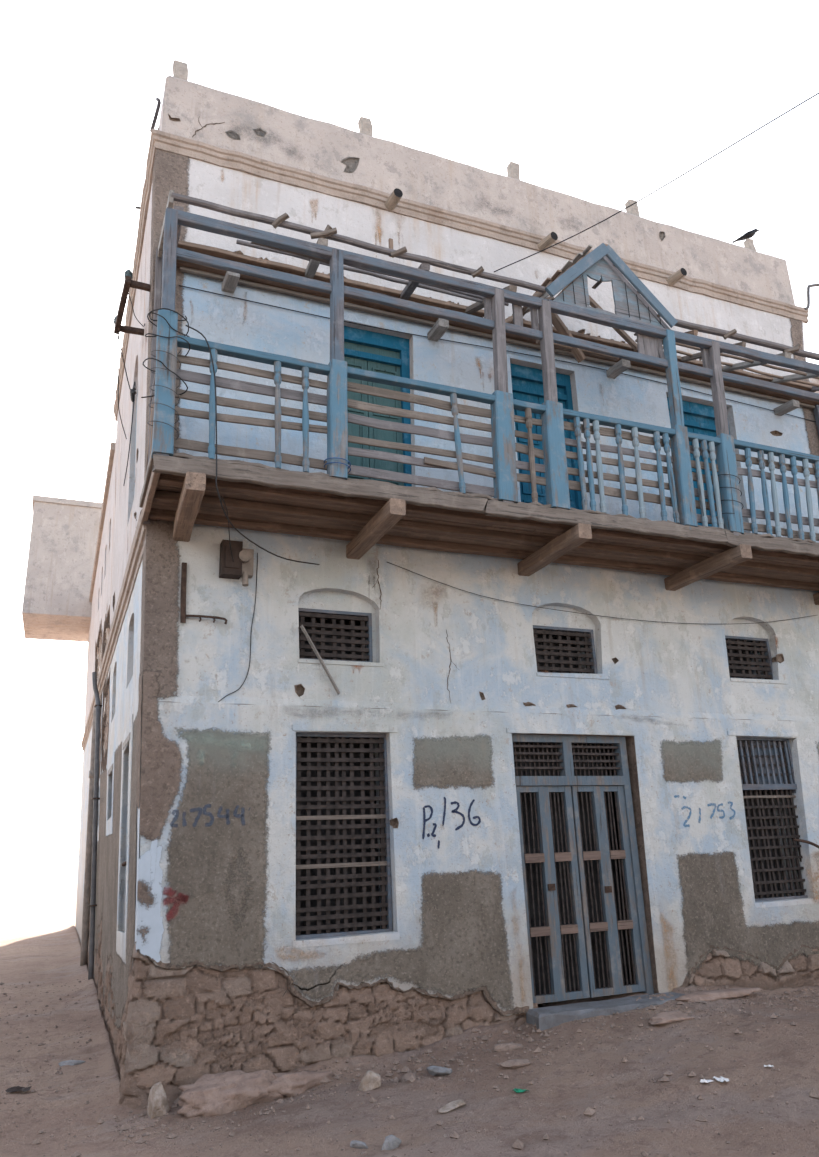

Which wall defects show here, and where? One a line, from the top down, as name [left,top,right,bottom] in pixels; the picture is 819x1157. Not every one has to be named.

peeling [95,592,115,778]
spalling [87,804,538,1110]